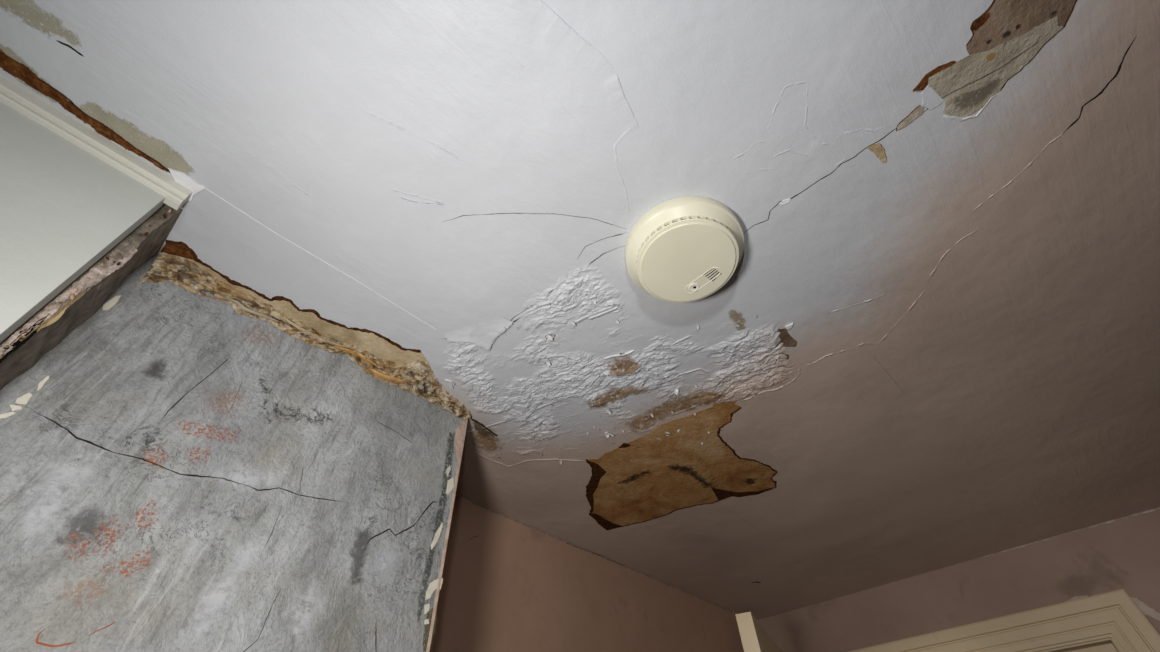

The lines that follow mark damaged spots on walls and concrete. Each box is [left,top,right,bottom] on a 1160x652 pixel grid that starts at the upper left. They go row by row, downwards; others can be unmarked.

damp [0,0,79,45]
peeling [896,0,1077,131]
crack [1066,37,1136,130]
crack [745,129,895,232]
crack [160,358,242,423]
peeling [0,203,797,530]
crack [25,406,349,550]
crack [364,501,435,548]